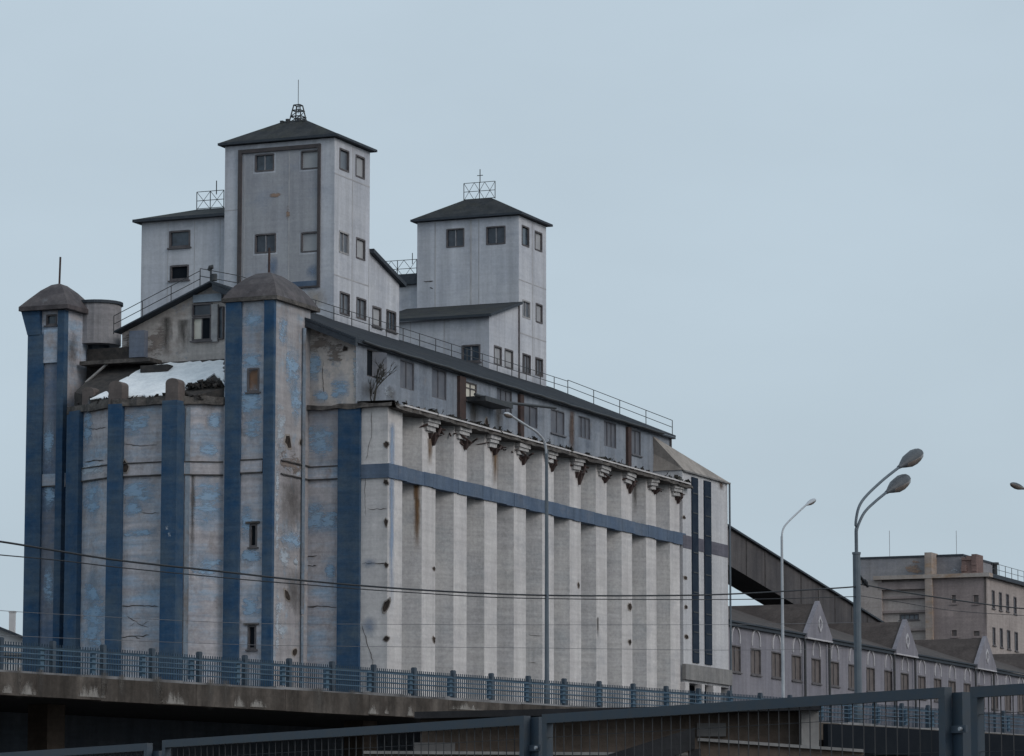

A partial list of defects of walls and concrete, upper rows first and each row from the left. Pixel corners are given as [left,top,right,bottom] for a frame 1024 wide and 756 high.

crack [122,605,158,639]